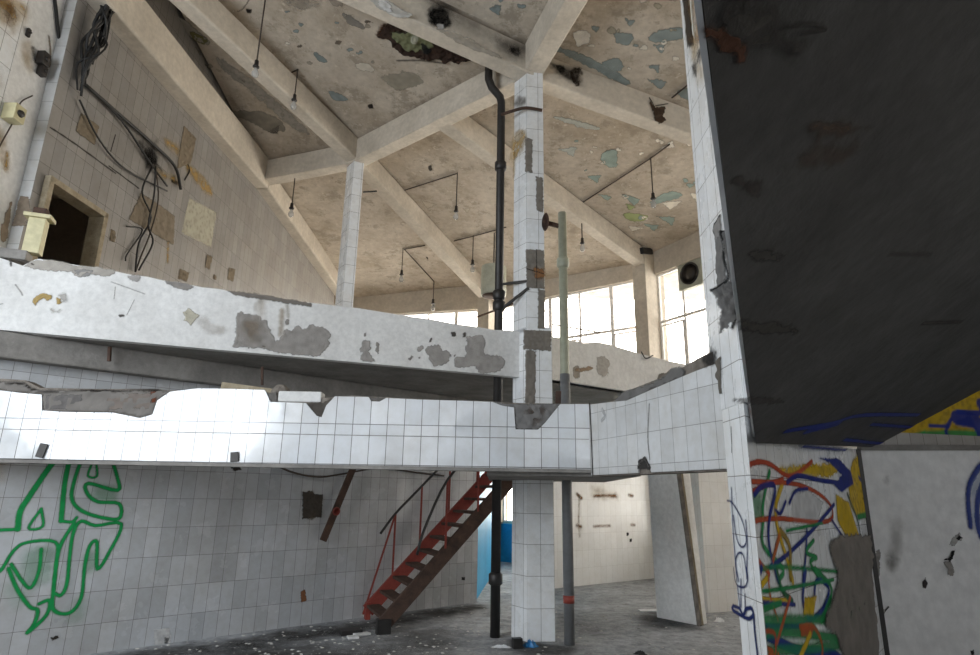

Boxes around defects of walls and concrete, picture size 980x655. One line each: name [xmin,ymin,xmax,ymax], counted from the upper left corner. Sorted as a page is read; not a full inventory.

corrosion [0,0,25,20]
spalling [330,0,502,91]
peeling [557,0,693,85]
spalling [649,97,668,124]
peeling [584,146,697,231]
spalling [710,214,799,335]
peeling [233,311,331,357]
peeling [408,332,505,374]
spalling [494,249,559,430]